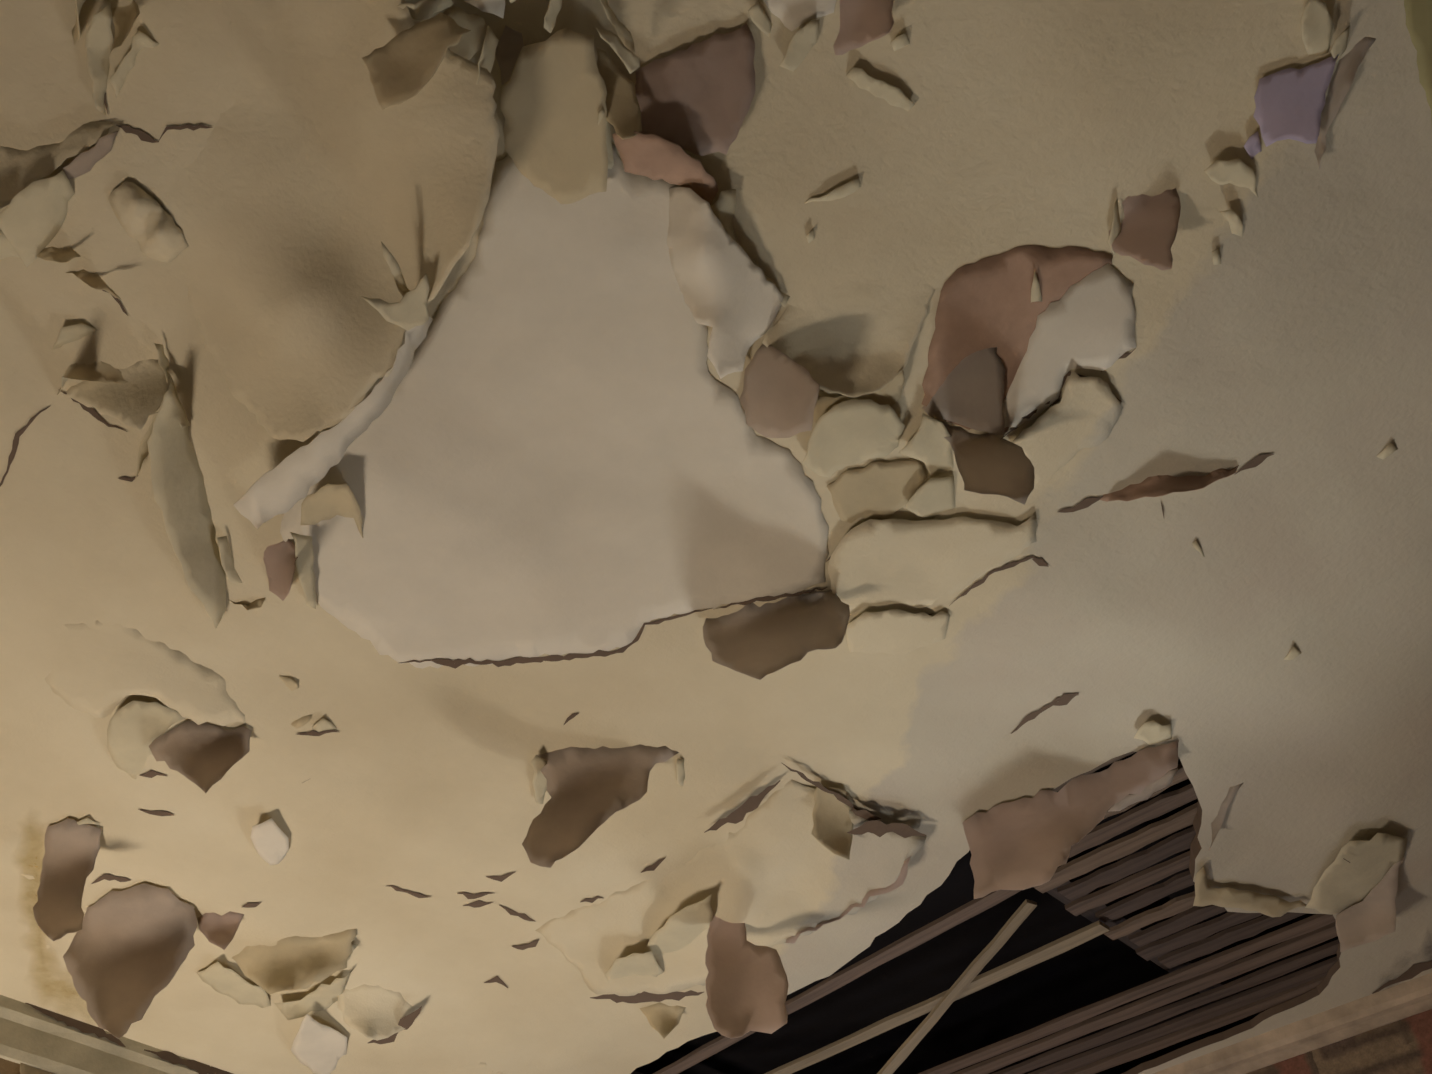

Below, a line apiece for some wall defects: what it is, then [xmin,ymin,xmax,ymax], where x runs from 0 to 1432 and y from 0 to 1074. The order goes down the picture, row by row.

peeling [0,0,159,316]
peeling [1220,209,1243,237]
peeling [1204,0,1376,197]
peeling [1404,0,1432,118]
flaking render [52,0,1181,680]
peeling [45,620,251,793]
peeling [33,817,422,1074]
peeling [535,763,927,1039]
peeling [963,720,1179,899]
peeling [1193,783,1407,952]
peeling [20,1062,54,1074]